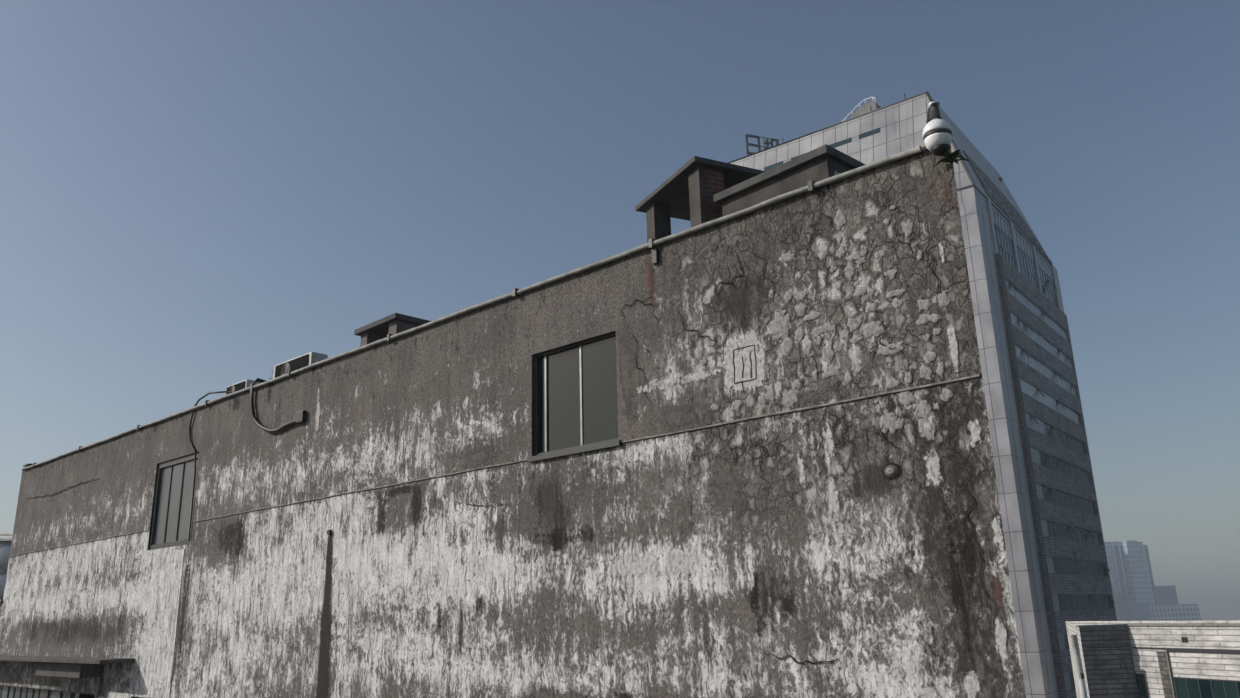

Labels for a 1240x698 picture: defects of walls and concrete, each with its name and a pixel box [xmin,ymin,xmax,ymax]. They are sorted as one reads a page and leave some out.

crack [804,189,832,249]
crack [716,231,774,306]
peeling [637,209,907,411]
crack [619,294,717,404]
peeling [880,291,958,485]
peeling [968,419,981,447]
leakage [375,485,425,537]
leakage [171,558,190,698]
leakage [316,530,333,698]
leakage [458,598,483,657]
peeling [995,619,1008,659]
peeling [964,671,980,698]